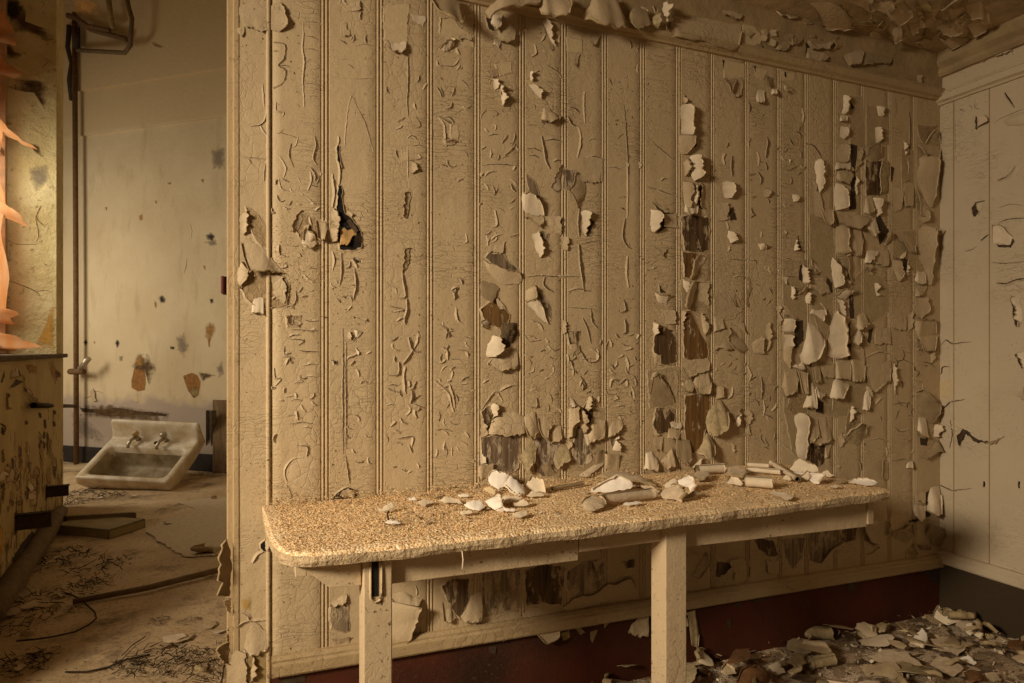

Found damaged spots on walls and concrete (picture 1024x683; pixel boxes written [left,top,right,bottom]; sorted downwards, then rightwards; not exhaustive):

peeling [485,0,920,112]
peeling [526,70,561,123]
peeling [237,205,302,328]
spalling [291,184,364,263]
crack [239,0,677,474]
peeling [379,94,1004,525]
peeling [79,356,167,438]
spalling [183,372,212,398]
peeling [441,557,636,624]
peeling [537,623,609,644]
peeling [628,616,649,638]
peeling [686,610,699,648]